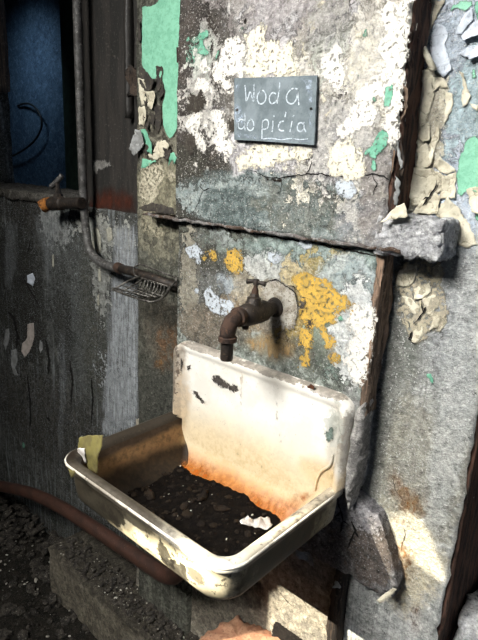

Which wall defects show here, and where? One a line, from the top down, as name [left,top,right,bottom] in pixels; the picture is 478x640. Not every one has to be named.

peeling [129,0,190,240]
peeling [181,0,416,200]
peeling [380,0,478,248]
crack [250,161,392,195]
peeling [185,243,244,275]
peeling [266,251,283,264]
peeling [3,323,43,377]
peeling [194,286,235,316]
peeling [260,270,378,387]
peeling [393,260,449,345]
peeling [377,588,397,604]